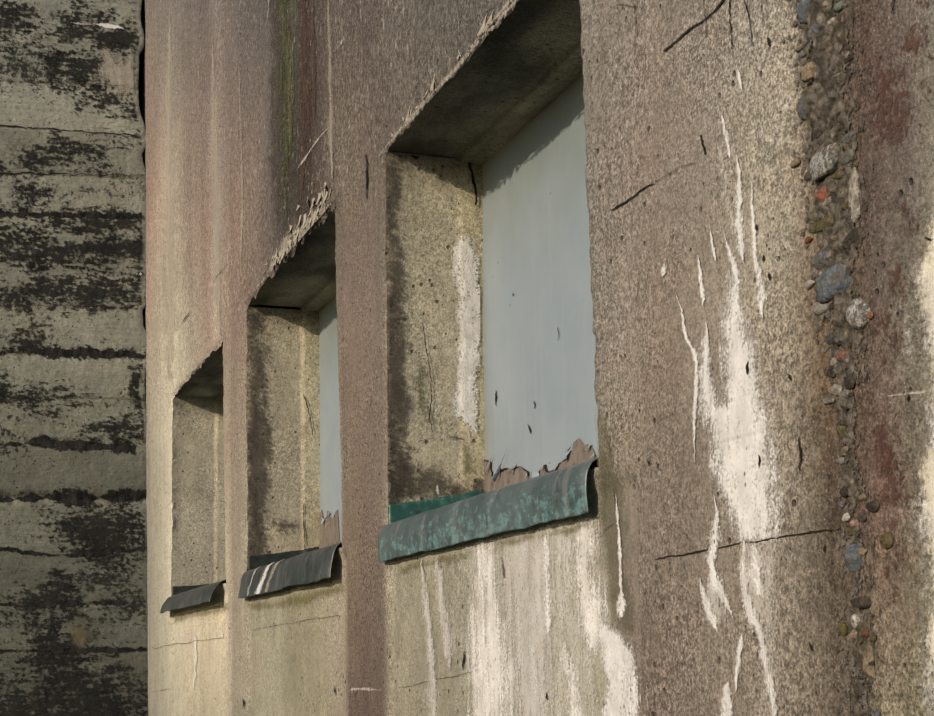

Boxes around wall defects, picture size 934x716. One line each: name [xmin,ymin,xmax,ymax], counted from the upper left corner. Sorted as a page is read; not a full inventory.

crack [664,0,753,52]
water stain [0,0,143,358]
spalling [245,182,331,299]
crack [419,324,463,441]
water stain [449,233,481,442]
water stain [401,447,641,716]
peeling [484,438,598,493]
crack [611,163,693,211]
water stain [676,115,784,716]
crack [654,527,841,560]
spalling [781,0,894,716]
water stain [879,207,934,588]